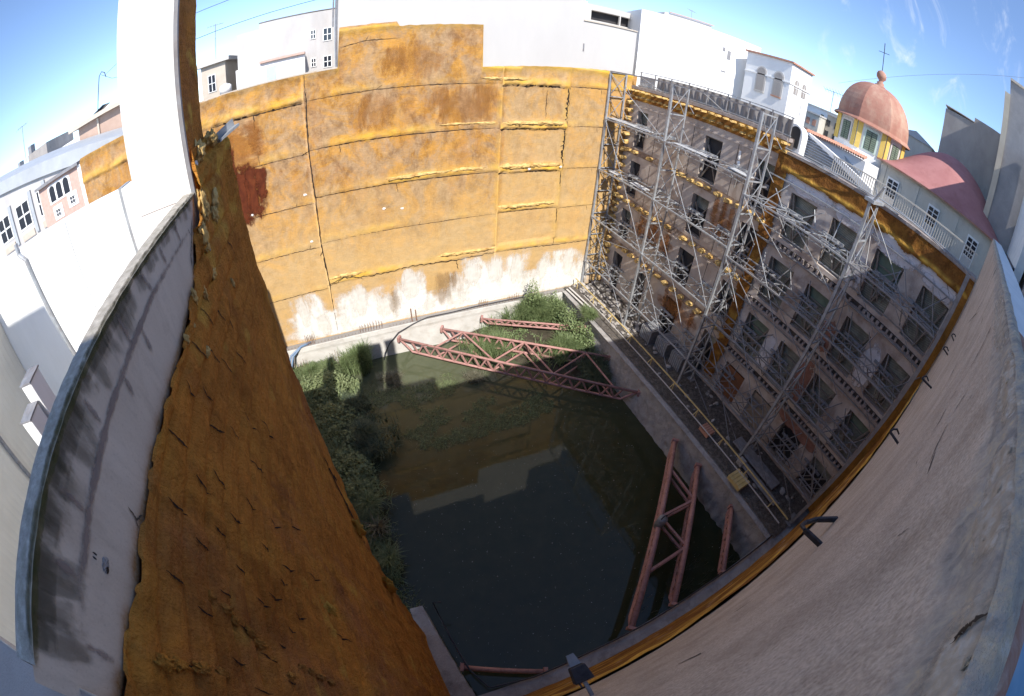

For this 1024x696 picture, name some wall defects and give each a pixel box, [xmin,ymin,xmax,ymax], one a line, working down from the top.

corrosion [231,149,268,225]
crack [213,80,617,330]
crack [186,380,273,439]
crack [324,457,367,550]
crack [169,469,320,695]